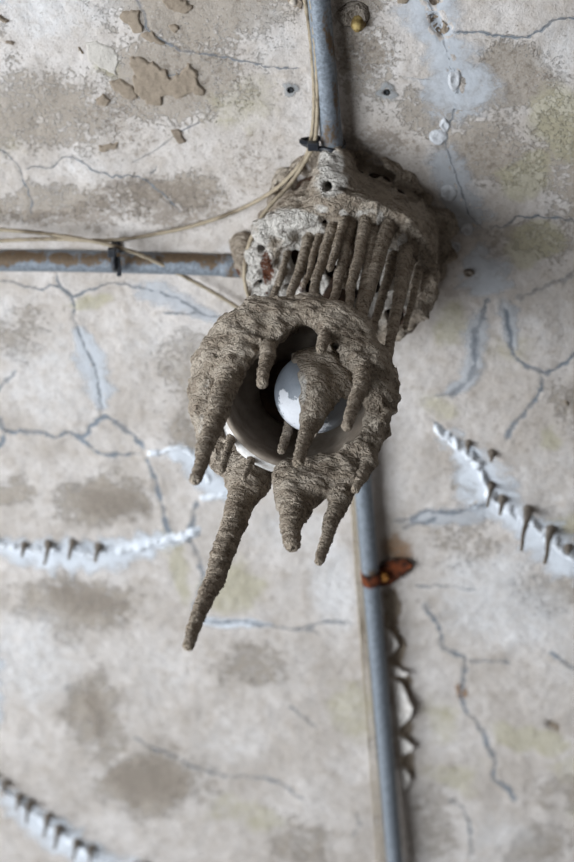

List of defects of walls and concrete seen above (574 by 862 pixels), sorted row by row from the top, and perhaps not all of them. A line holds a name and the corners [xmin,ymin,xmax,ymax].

spalling [78,40,205,107]
spalling [119,10,165,45]
spalling [162,0,193,14]
crack [144,19,297,70]
crack [0,150,180,211]
crack [483,298,574,438]
crack [0,276,219,578]
crack [408,503,486,525]
efflorescence [414,424,574,578]
efflorescence [0,526,201,575]
crack [426,611,516,801]
efflorescence [0,779,147,862]